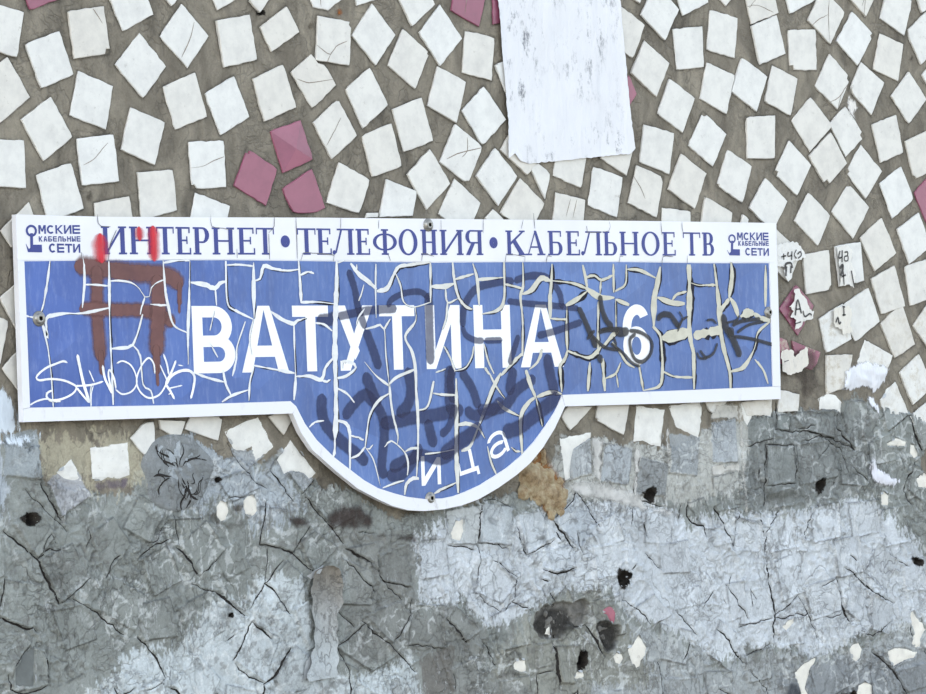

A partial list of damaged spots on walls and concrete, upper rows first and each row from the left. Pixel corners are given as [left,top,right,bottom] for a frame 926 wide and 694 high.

peeling [15,647,37,688]
crack [0,483,180,694]
crack [142,443,435,694]
crack [447,619,495,665]
crack [448,492,599,611]
spalling [538,602,581,637]
crack [536,625,603,694]
crack [631,402,926,694]